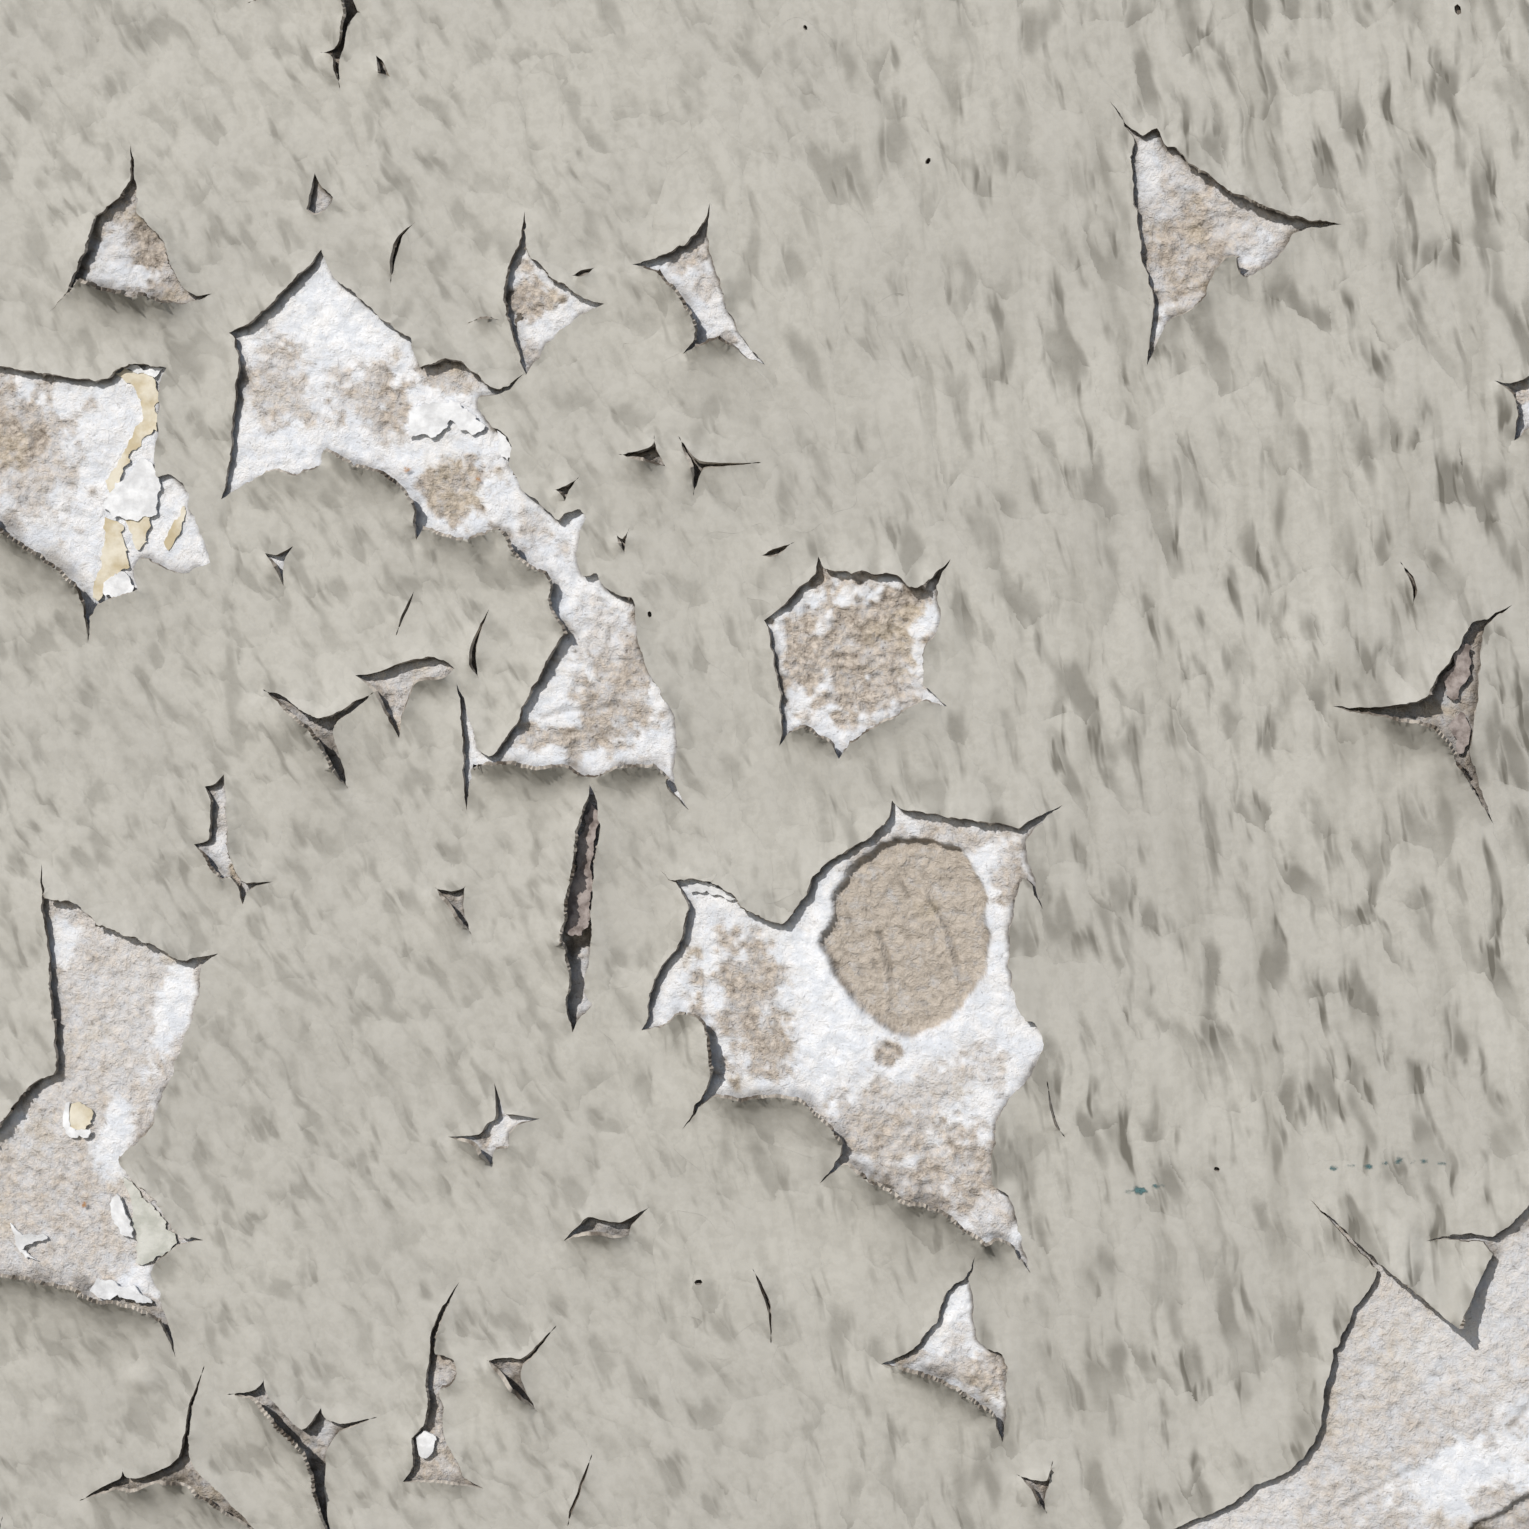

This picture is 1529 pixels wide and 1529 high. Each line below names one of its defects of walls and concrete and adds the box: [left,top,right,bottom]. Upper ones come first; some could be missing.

peeling [41,156,212,329]
peeling [617,208,764,380]
peeling [1111,103,1340,362]
peeling [0,343,210,666]
peeling [212,223,694,832]
peeling [179,776,270,904]
peeling [754,554,953,774]
peeling [1302,600,1510,853]
peeling [0,861,217,1382]
peeling [627,788,1061,1463]
peeling [398,1286,480,1502]
peeling [1096,1127,1529,1529]